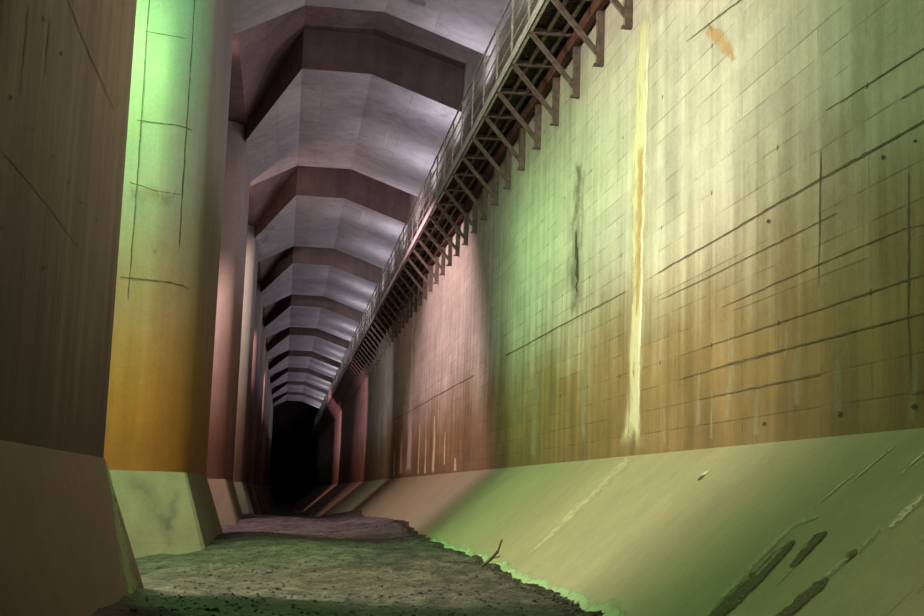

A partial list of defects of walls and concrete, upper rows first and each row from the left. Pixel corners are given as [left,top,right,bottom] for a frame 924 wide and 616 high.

crack [120,0,195,298]
spalling [708,516,826,616]
spalling [776,529,878,616]